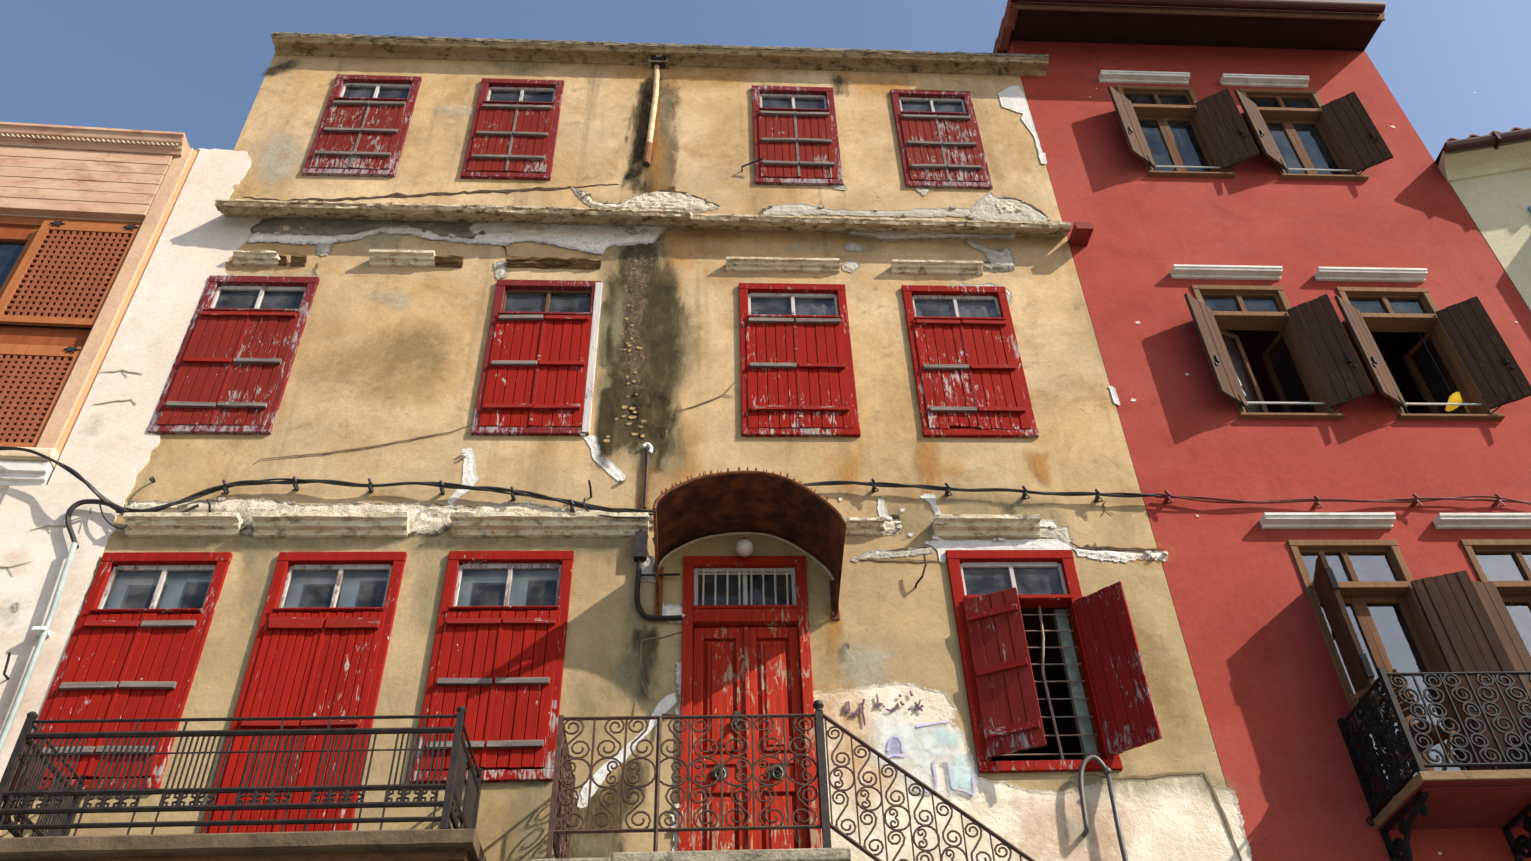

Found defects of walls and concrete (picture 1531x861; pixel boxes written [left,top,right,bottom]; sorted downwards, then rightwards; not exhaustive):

damp [623,78,679,193]
peeling [998,85,1047,164]
flaking render [247,187,720,255]
flaking render [762,192,1051,305]
damp [598,243,686,469]
flaking render [125,497,605,537]
flaking render [854,508,939,545]
flaking render [1040,519,1168,563]
flaking render [813,681,1252,861]